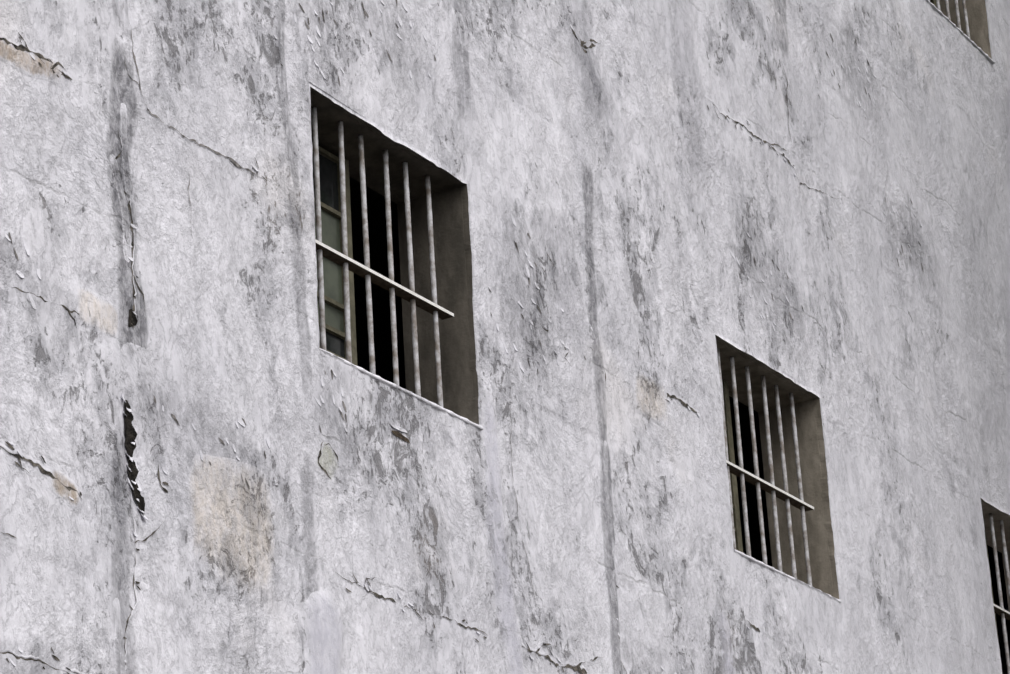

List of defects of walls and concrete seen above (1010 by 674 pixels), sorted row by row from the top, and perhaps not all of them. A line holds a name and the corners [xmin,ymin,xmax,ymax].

crack [0,34,72,80]
flaking render [0,157,382,605]
spalling [391,425,410,443]
crack [337,573,487,642]
crack [521,641,598,674]